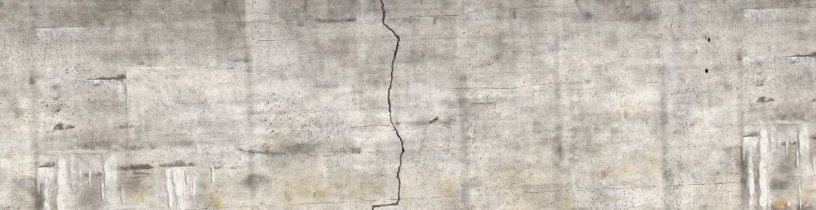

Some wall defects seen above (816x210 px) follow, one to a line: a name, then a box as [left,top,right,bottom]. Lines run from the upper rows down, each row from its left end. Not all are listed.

crack [352,0,404,210]
leakage [37,157,150,210]
leakage [165,162,196,210]
leakage [744,128,814,210]